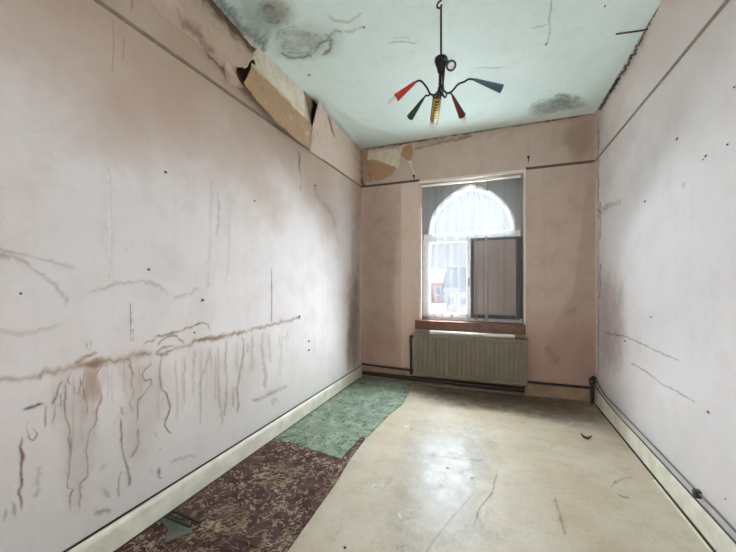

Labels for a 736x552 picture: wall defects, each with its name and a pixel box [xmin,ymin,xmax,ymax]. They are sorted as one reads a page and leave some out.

spalling [236,35,318,130]
spalling [367,143,415,175]
water stain [18,432,37,505]